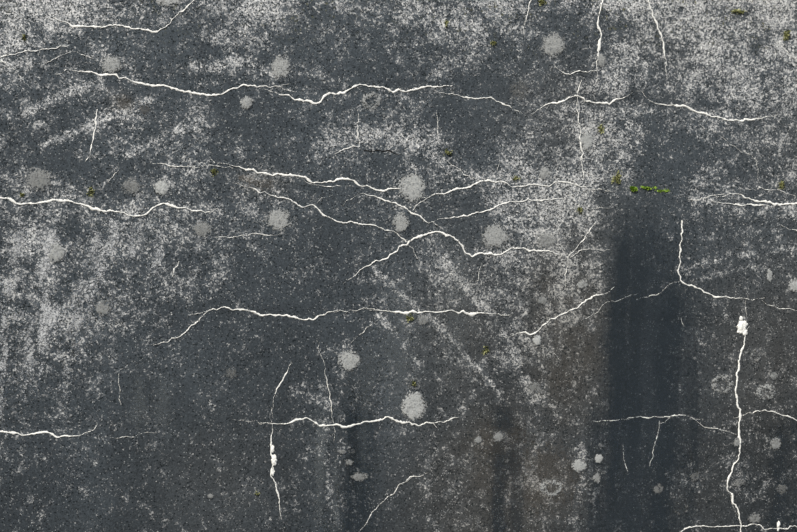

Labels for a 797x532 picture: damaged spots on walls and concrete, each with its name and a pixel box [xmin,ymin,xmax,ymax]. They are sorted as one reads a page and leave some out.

crack [0,0,797,287]
crack [0,423,98,438]
crack [155,220,797,532]
water stain [736,316,748,336]